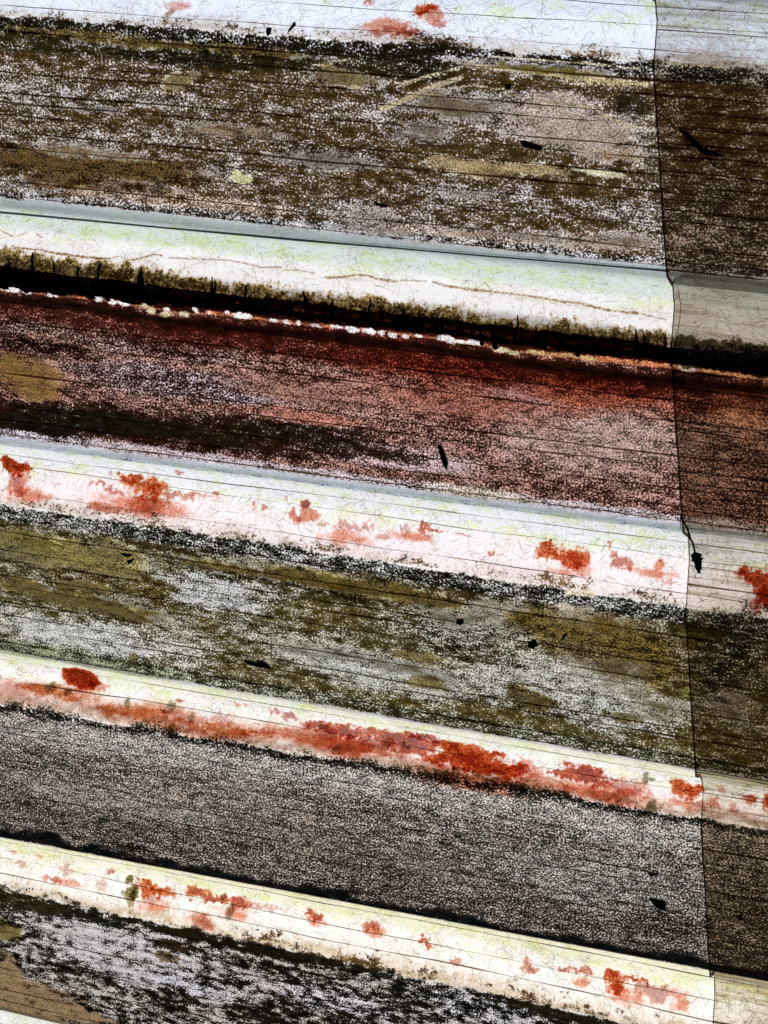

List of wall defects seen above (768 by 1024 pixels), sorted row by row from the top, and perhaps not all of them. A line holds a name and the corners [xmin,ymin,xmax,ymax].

corrosion [365,3,447,38]
damp [79,180,185,199]
corrosion [0,455,51,502]
corrosion [89,471,219,517]
corrosion [289,499,443,544]
corrosion [533,539,590,576]
corrosion [607,541,665,578]
corrosion [16,667,657,818]
corrosion [669,777,768,811]
corrosion [134,876,257,930]
corrosion [305,908,325,926]
corrosion [558,965,689,1010]